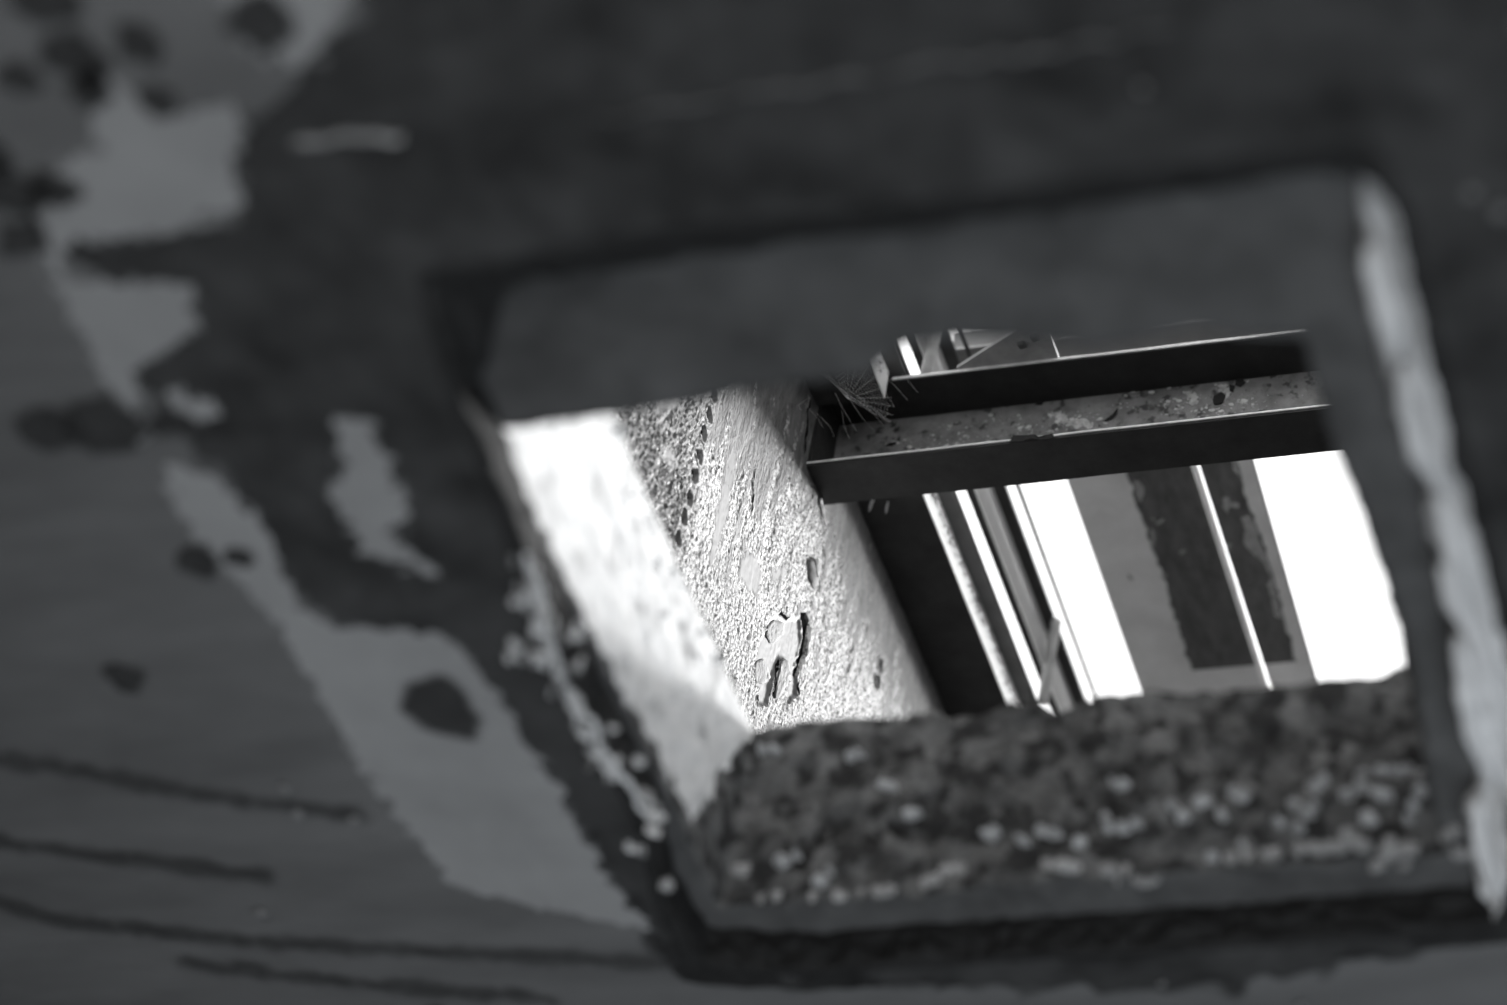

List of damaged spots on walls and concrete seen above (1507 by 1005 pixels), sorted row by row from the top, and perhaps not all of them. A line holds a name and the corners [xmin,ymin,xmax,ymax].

peeling [31,66,247,445]
peeling [328,416,439,577]
peeling [162,462,666,931]
crack [757,609,800,705]
flaking render [660,876,675,893]